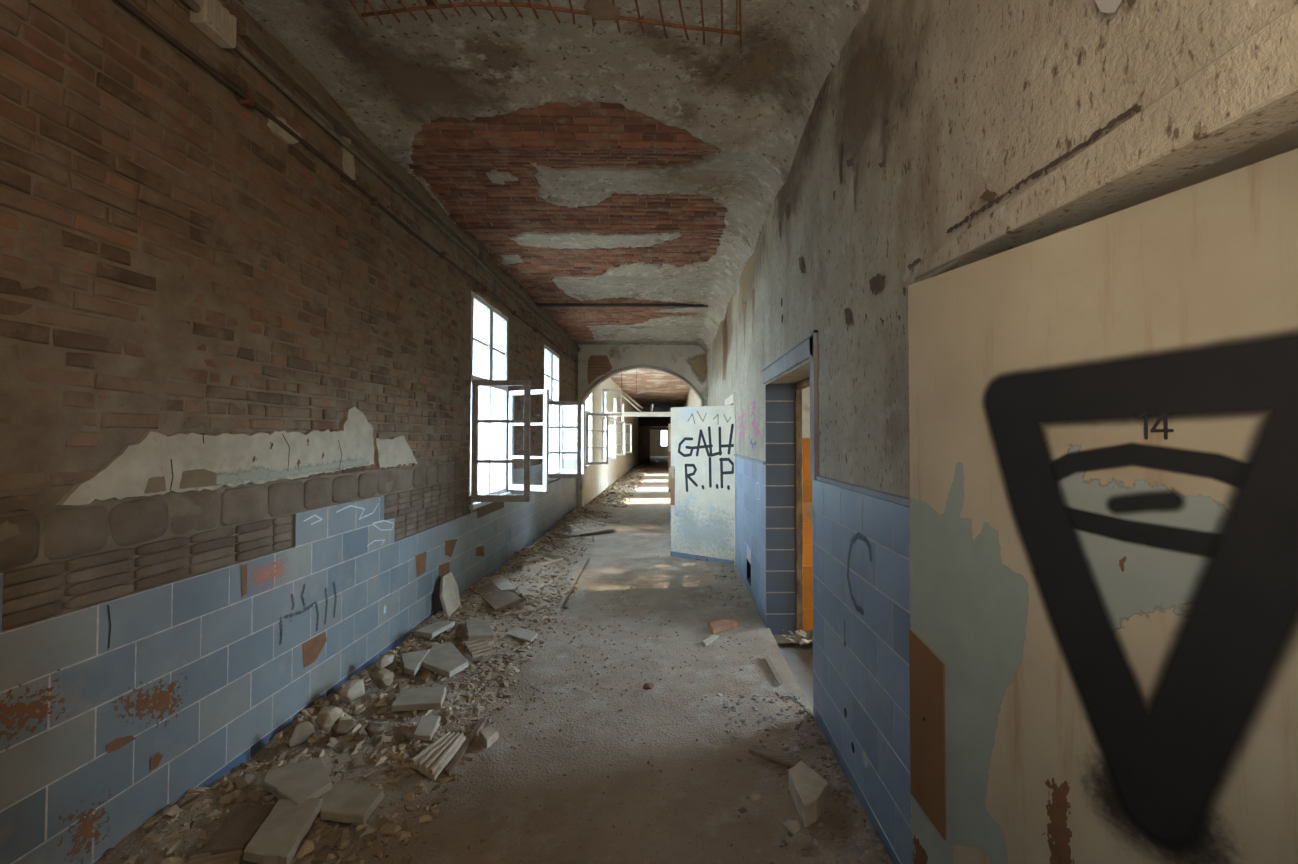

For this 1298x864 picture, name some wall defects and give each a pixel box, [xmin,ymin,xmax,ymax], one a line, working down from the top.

flaking render [1095,0,1136,13]
crack [946,104,1141,233]
flaking render [0,0,728,630]
peeling [913,834,928,864]
peeling [1042,778,1074,864]